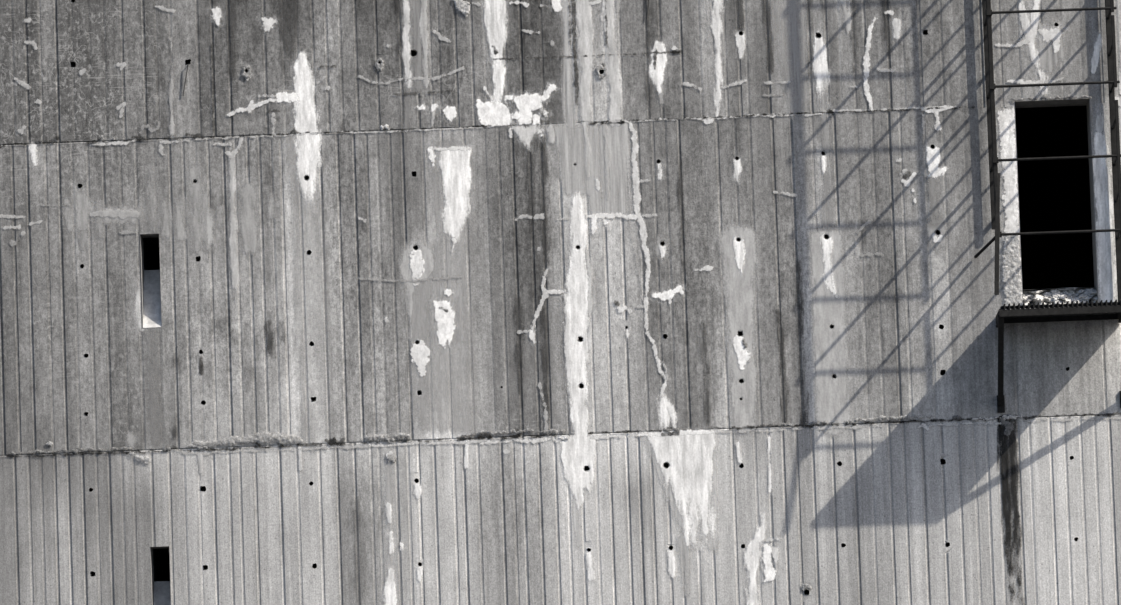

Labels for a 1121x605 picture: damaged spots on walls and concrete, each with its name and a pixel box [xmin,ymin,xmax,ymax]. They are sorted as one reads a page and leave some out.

damp [227,0,322,201]
efflorescence [483,0,529,103]
damp [399,143,474,432]
crack [0,0,975,457]
damp [513,298,524,393]
damp [526,0,638,548]
damp [654,218,685,259]
damp [637,324,719,596]
damp [718,224,758,434]
efflorescence [744,513,779,605]
crack [712,412,1121,430]